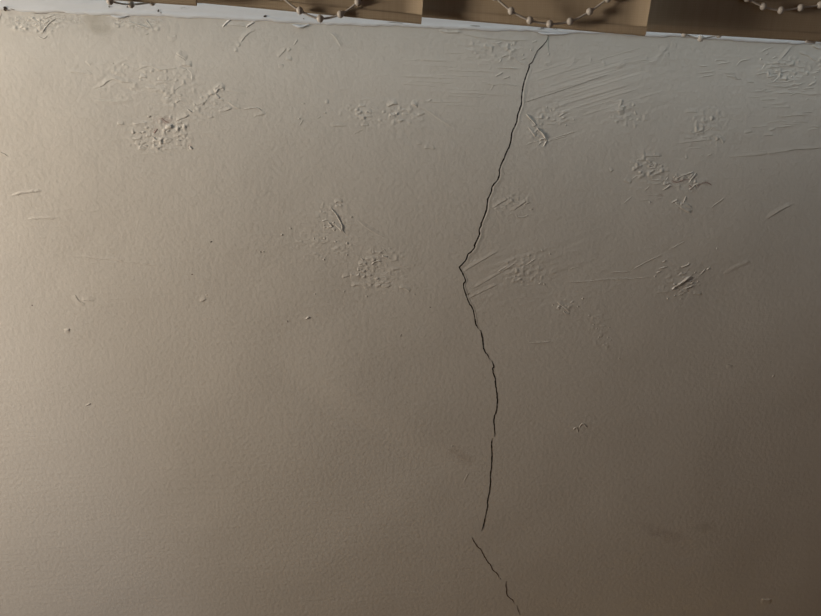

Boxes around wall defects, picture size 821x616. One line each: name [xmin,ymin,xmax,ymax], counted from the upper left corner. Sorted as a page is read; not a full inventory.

crack [459,35,608,612]